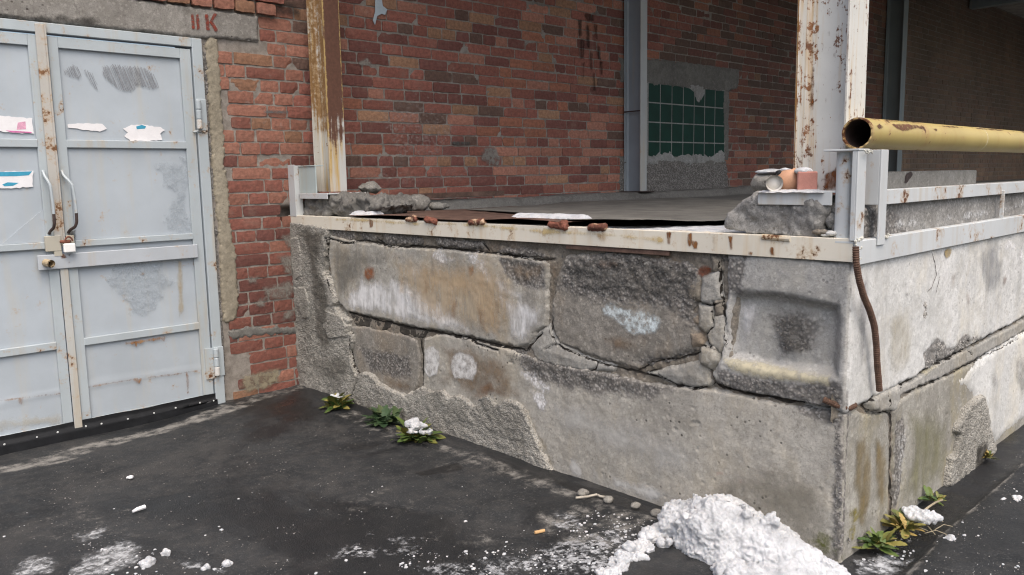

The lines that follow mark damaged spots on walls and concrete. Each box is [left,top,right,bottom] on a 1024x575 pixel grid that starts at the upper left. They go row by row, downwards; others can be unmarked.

rust [877,120,954,131]
rust [817,168,836,189]
peeling [289,223,554,470]
peeling [943,394,997,487]